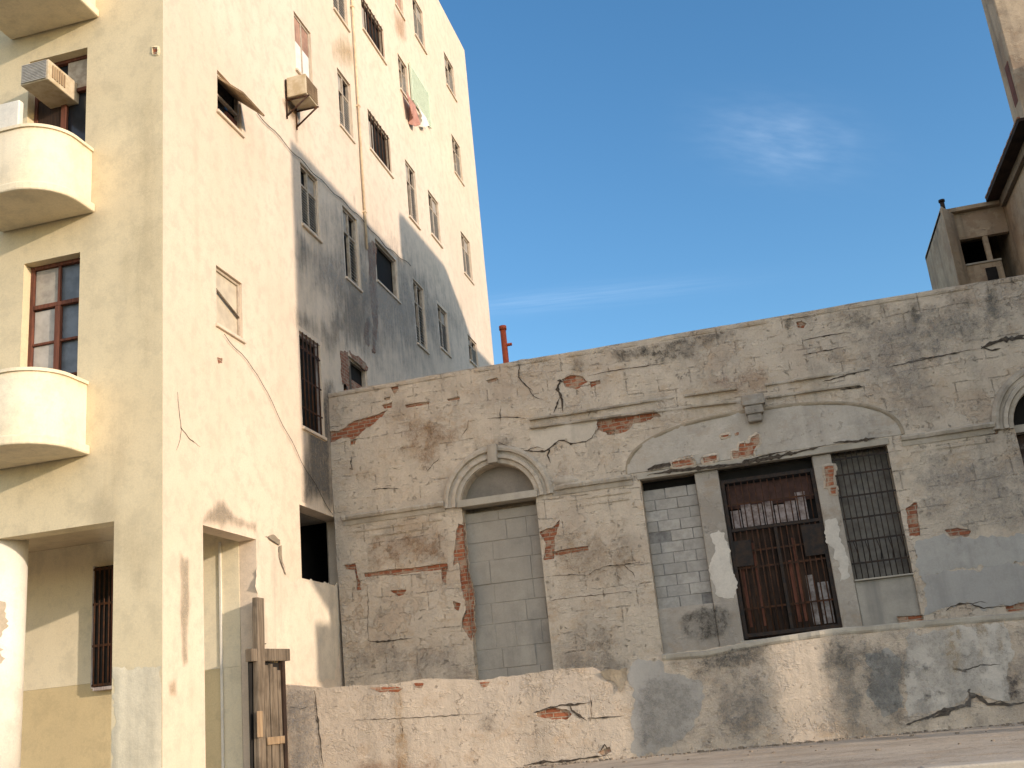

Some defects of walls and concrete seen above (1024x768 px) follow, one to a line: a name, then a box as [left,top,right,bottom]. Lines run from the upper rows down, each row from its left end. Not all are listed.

crack [822,335,1024,390]
crack [518,364,563,411]
spalling [330,387,399,445]
crack [461,409,598,463]
flaking render [529,413,661,450]
spalling [669,432,762,469]
spalling [540,522,588,560]
spalling [906,503,920,536]
spalling [345,523,477,639]
crack [947,601,1001,610]
crack [534,697,620,721]
crack [906,664,1024,725]